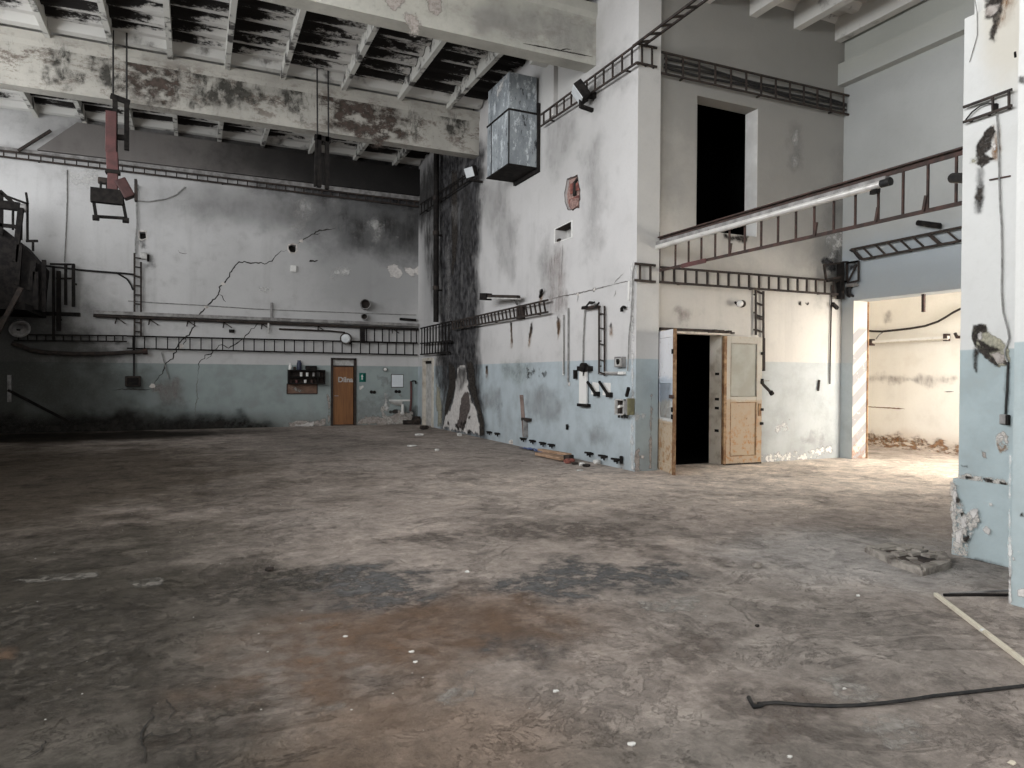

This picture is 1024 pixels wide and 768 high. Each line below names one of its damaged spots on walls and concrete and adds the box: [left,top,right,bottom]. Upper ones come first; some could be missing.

spalling [985,0,1009,40]
mould [43,51,84,82]
damp [91,56,180,107]
damp [190,73,302,112]
damp [319,95,408,148]
spalling [564,175,580,211]
spalling [975,126,1000,211]
crack [117,228,335,417]
spalling [972,324,1010,367]
damp [436,362,456,427]
peeling [443,365,480,435]
peeling [950,473,1011,556]